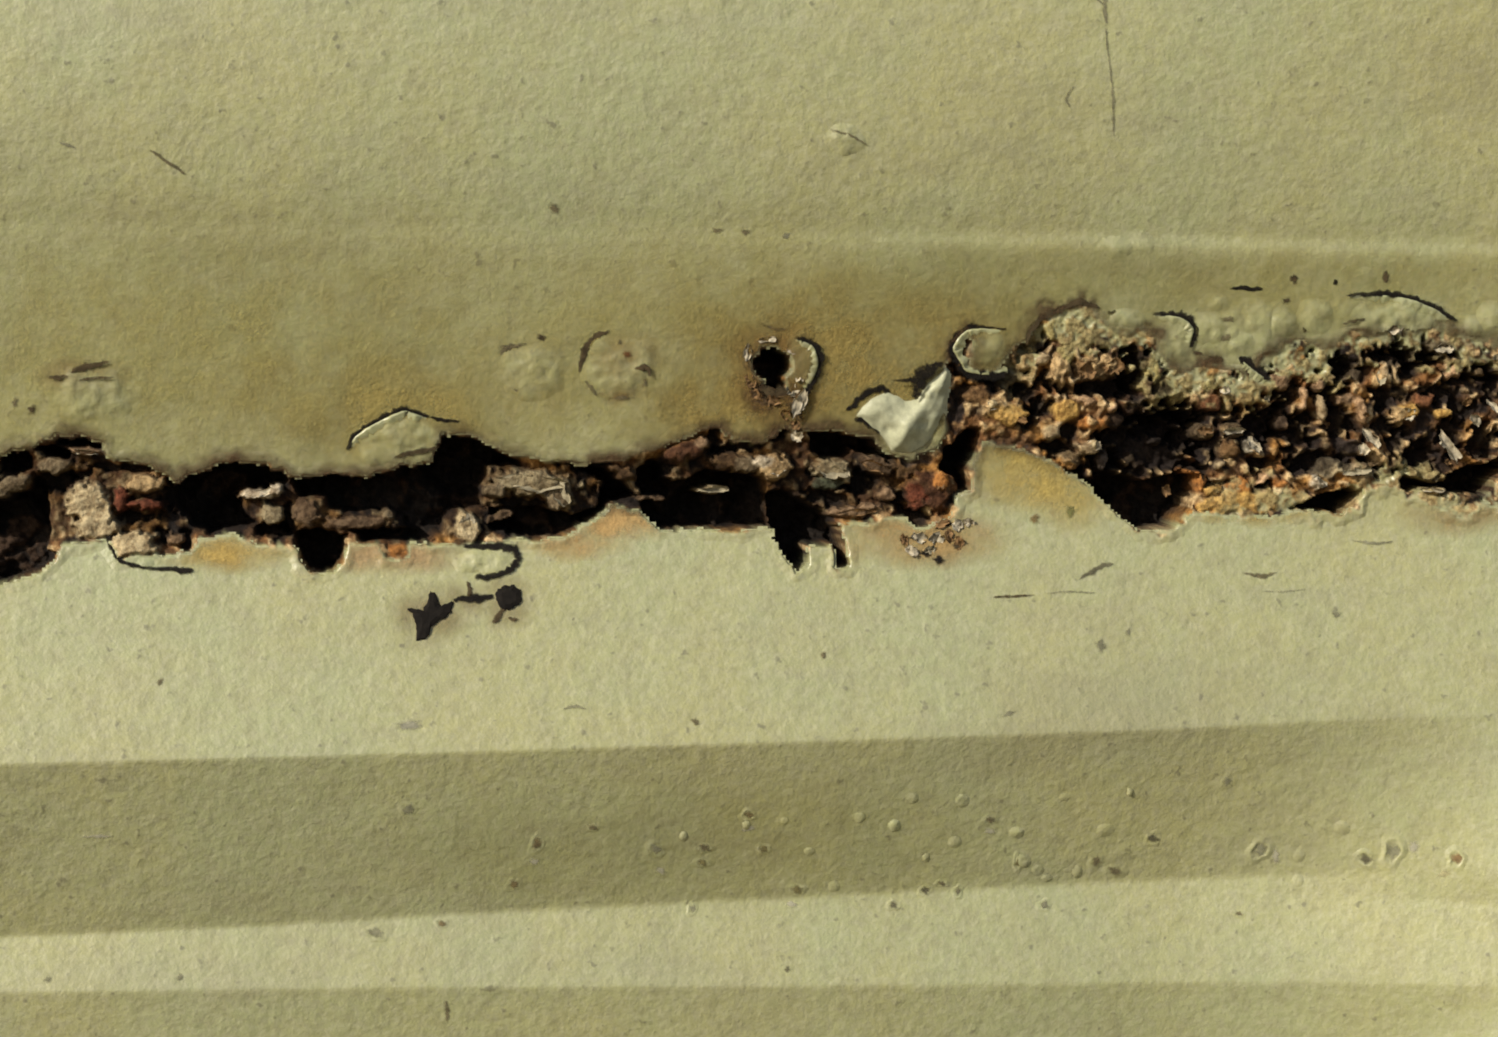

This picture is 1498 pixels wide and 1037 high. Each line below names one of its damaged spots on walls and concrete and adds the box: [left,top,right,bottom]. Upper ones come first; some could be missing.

spalling [0,444,66,583]
peeling [101,535,193,574]
spalling [178,435,877,581]
corrosion [140,292,1498,586]
spalling [791,430,892,479]